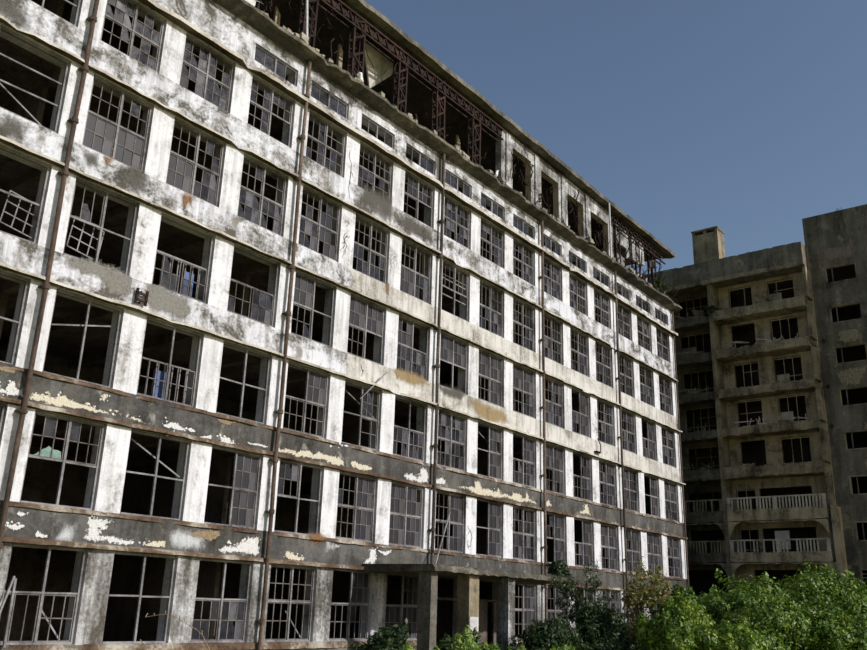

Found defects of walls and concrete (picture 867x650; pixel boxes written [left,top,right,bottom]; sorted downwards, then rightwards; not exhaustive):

peeling [0,366,143,423]
peeling [247,436,372,471]
peeling [457,481,552,507]
peeling [84,515,166,548]
peeling [186,530,261,556]